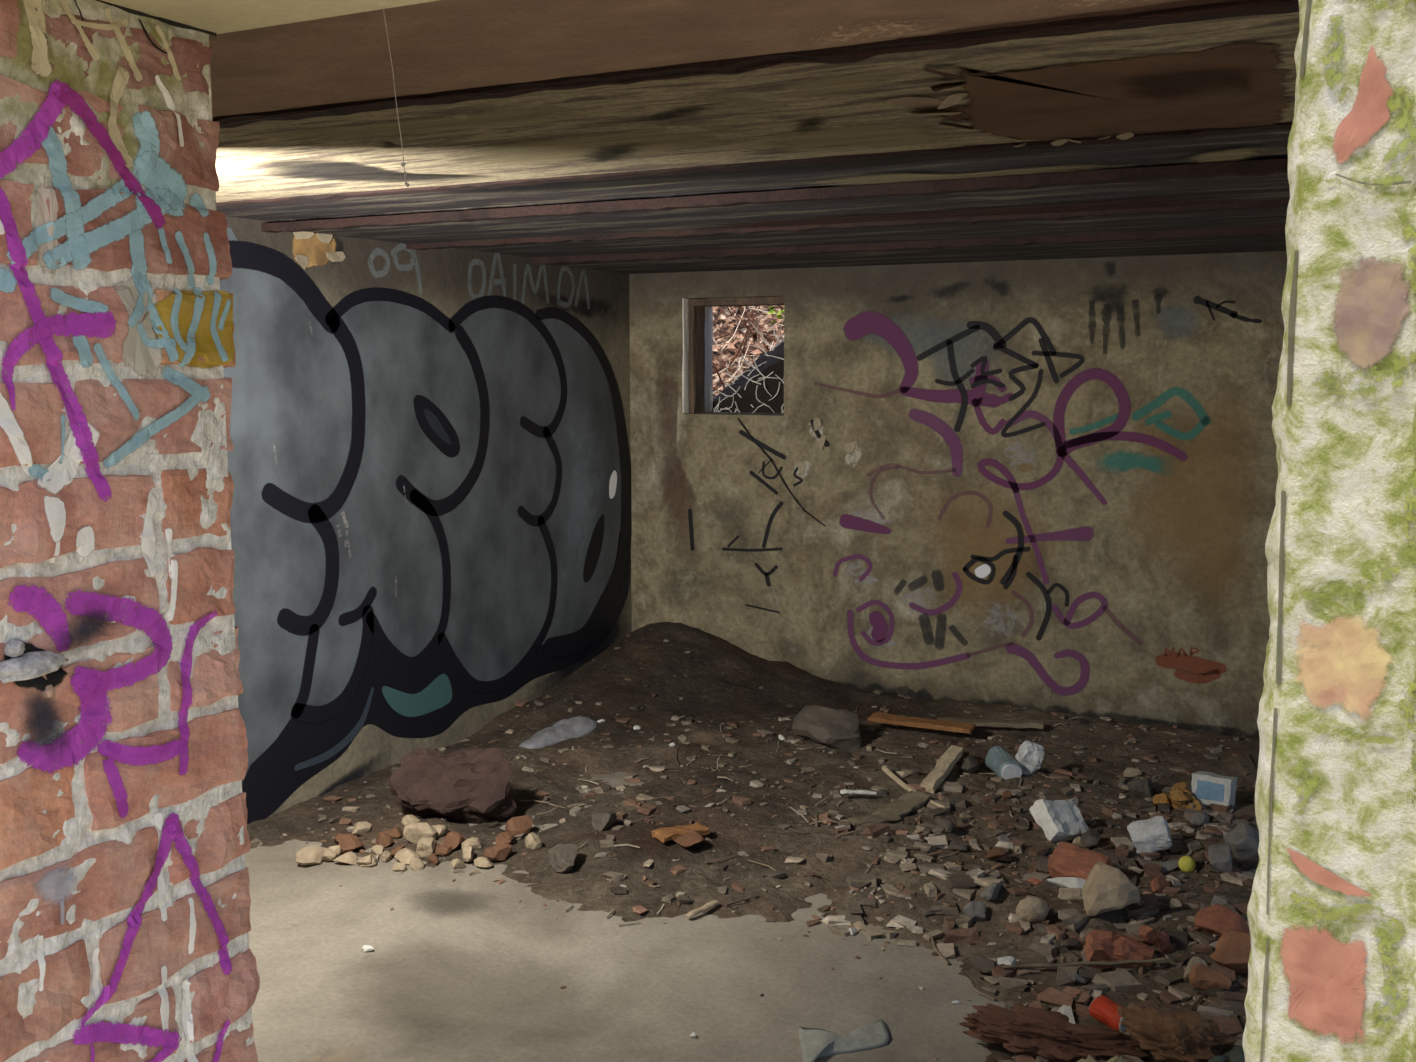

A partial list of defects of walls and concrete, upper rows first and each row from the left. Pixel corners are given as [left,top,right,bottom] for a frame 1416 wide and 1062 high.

spalling [884,42,1291,147]